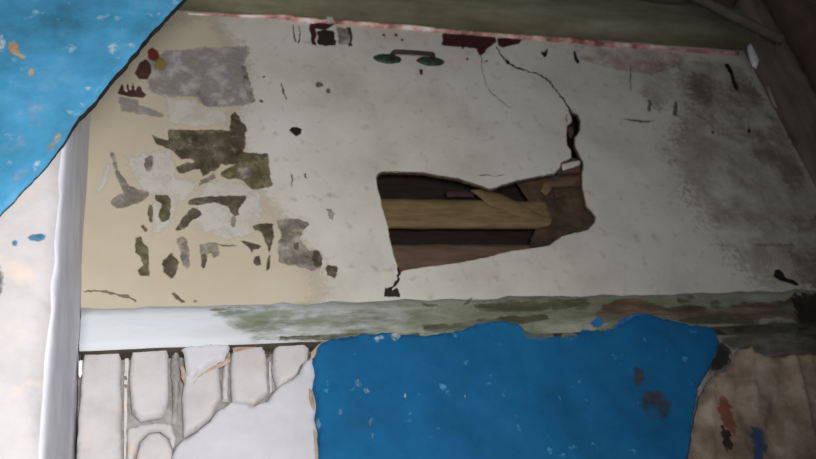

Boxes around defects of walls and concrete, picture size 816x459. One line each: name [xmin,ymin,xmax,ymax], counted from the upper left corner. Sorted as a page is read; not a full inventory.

peeling [0,35,26,59]
peeling [188,13,759,91]
crack [481,47,570,122]
peeling [110,47,273,278]
hole [376,109,596,250]
peeling [200,219,338,278]
crack [384,267,401,297]
mould [400,295,753,336]
flaking render [77,344,309,459]
flaking render [688,343,816,459]